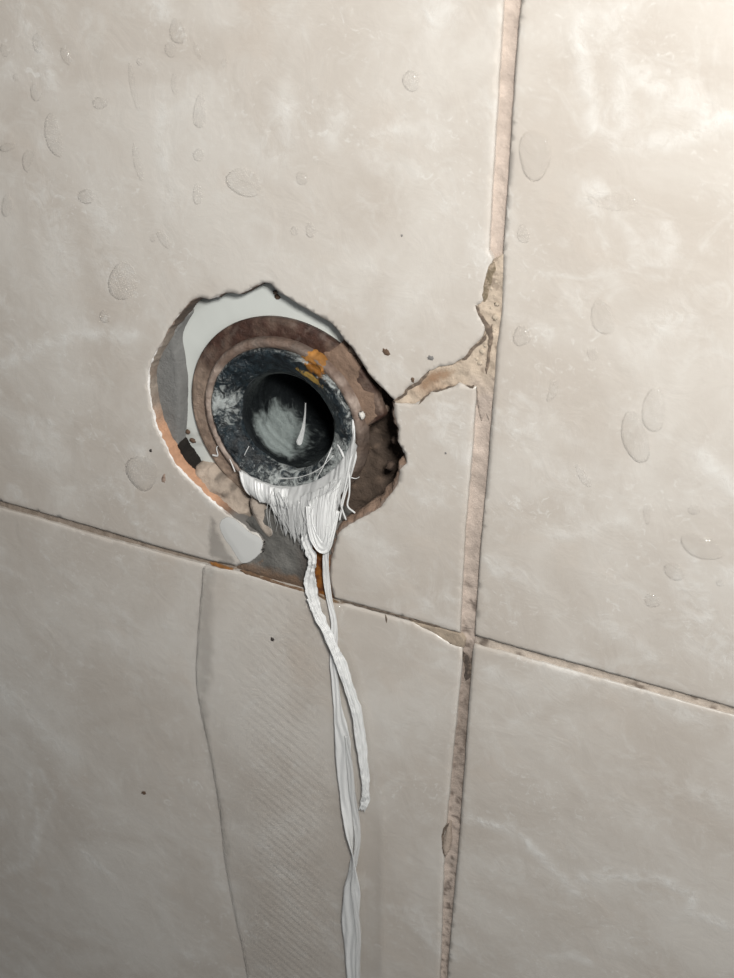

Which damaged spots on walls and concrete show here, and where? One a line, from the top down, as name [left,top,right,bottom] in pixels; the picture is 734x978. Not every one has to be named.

spalling [147,282,308,588]
corrosion [301,349,328,372]
spalling [323,339,466,648]
crack [394,254,503,424]